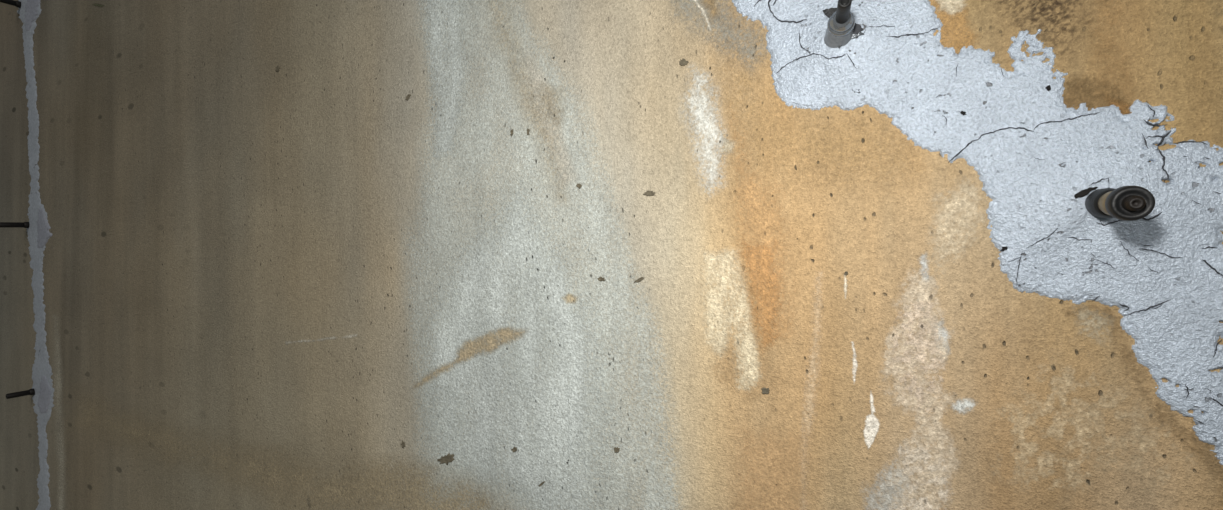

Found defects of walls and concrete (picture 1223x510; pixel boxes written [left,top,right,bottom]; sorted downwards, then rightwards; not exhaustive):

leakage [999,0,1076,40]
leakage [1064,78,1132,115]
crack [732,0,1223,465]